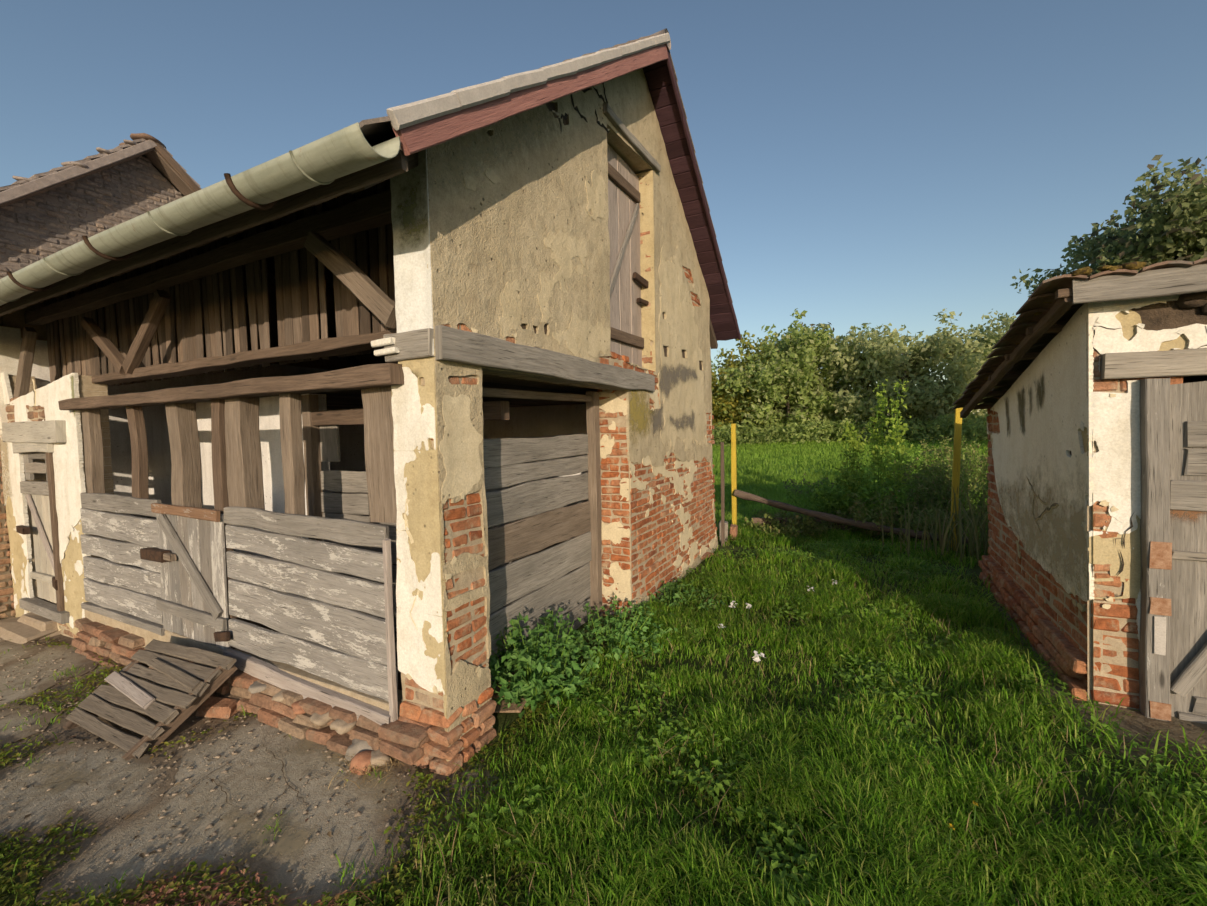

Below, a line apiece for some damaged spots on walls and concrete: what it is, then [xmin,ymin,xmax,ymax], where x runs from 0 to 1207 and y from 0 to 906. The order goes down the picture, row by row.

crack [552,83,610,134]
spalling [498,170,718,619]
water stain [1005,375,1044,434]
spalling [1087,349,1183,397]
spalling [1093,296,1207,351]
peeling [0,496,29,617]
peeling [391,367,489,717]
water stain [999,484,1087,593]
spalling [986,407,1141,710]